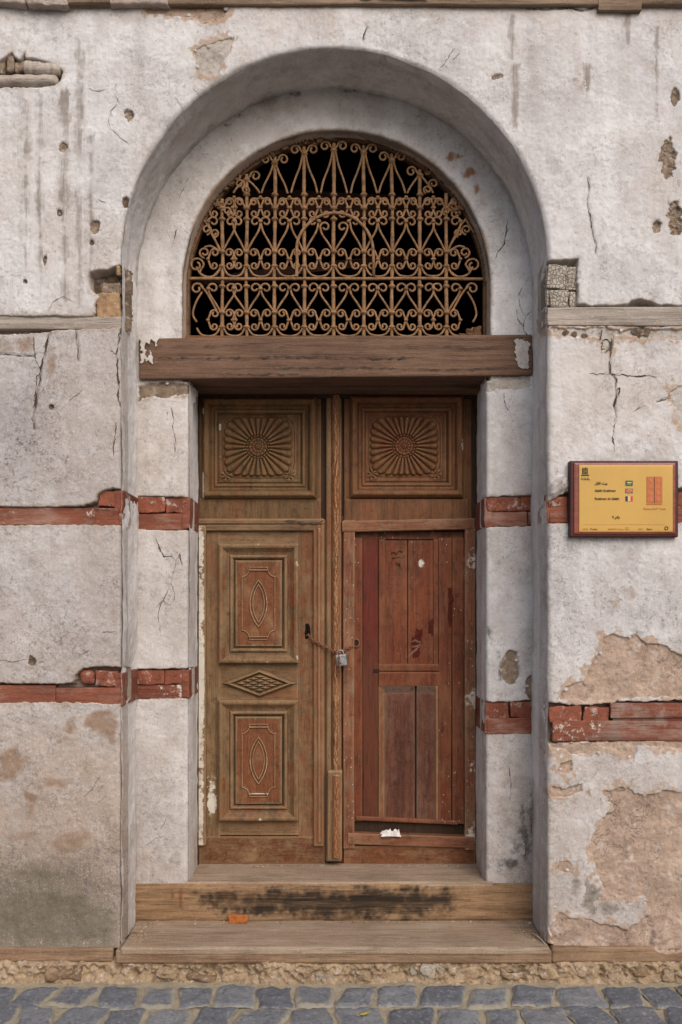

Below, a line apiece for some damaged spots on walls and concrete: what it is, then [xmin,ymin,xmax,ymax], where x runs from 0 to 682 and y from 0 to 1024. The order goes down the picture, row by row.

leakage [18,31,100,315]
spalling [658,137,678,180]
spalling [653,201,682,236]
crack [3,296,73,427]
crack [589,330,671,451]
crack [157,543,182,633]
flaking render [500,650,532,700]
flaking render [560,634,682,702]
leakage [53,705,124,750]
flaking render [548,740,682,773]
leakage [0,737,126,948]
flaking render [549,787,682,955]